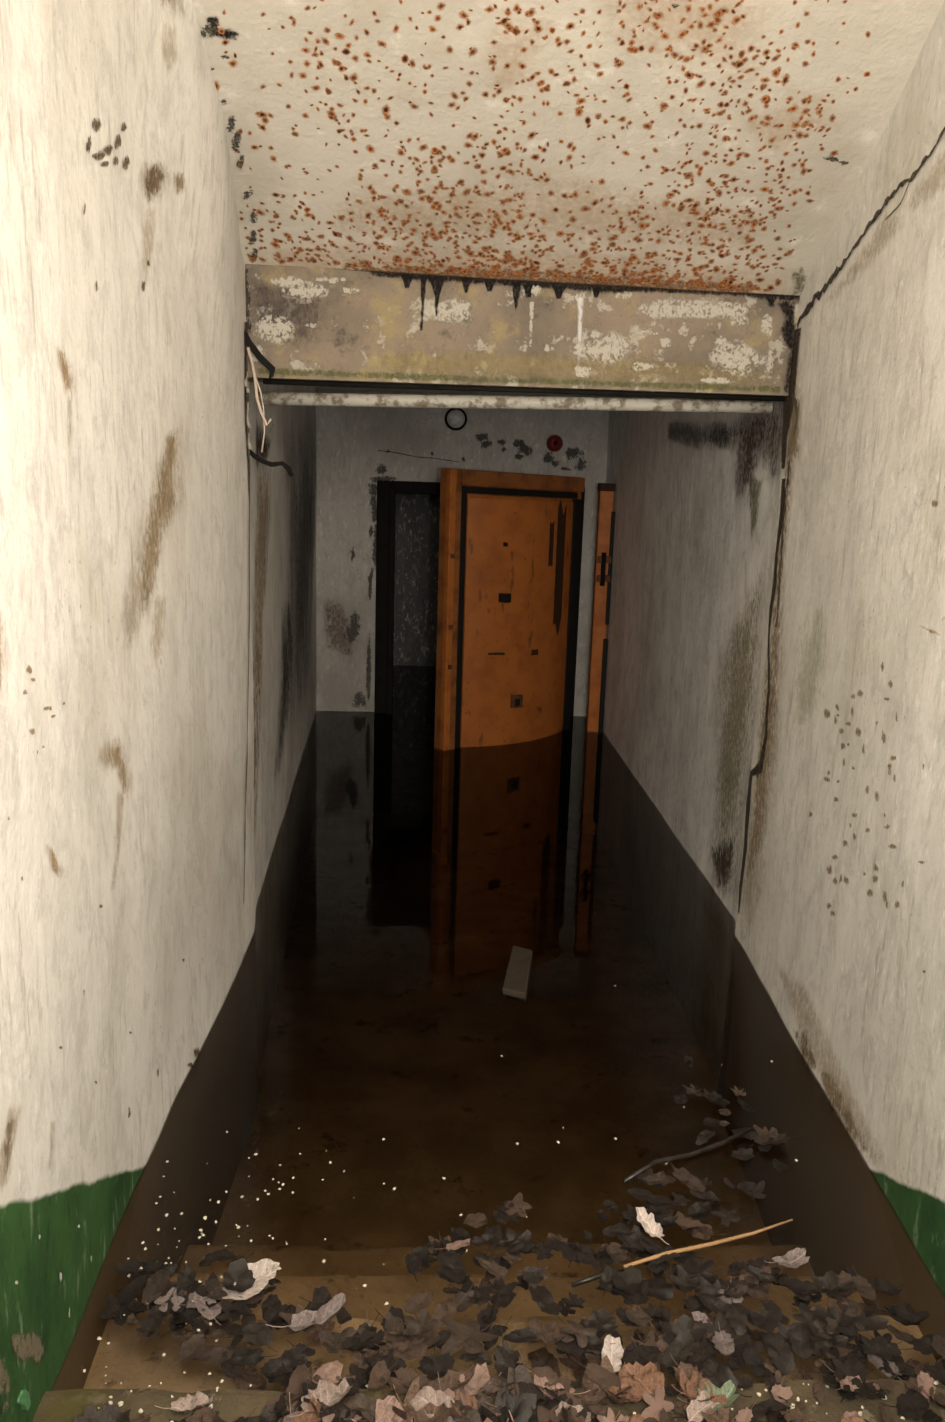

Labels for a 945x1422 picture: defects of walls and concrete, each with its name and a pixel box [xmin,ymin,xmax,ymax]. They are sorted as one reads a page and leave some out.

corrosion [216,10,237,67]
corrosion [237,0,870,294]
water stain [257,286,318,337]
peeling [423,298,471,323]
water stain [370,271,800,359]
peeling [544,291,795,393]
water stain [141,439,174,598]
water stain [253,422,270,802]
water stain [259,368,798,886]
peeling [0,1331,44,1412]